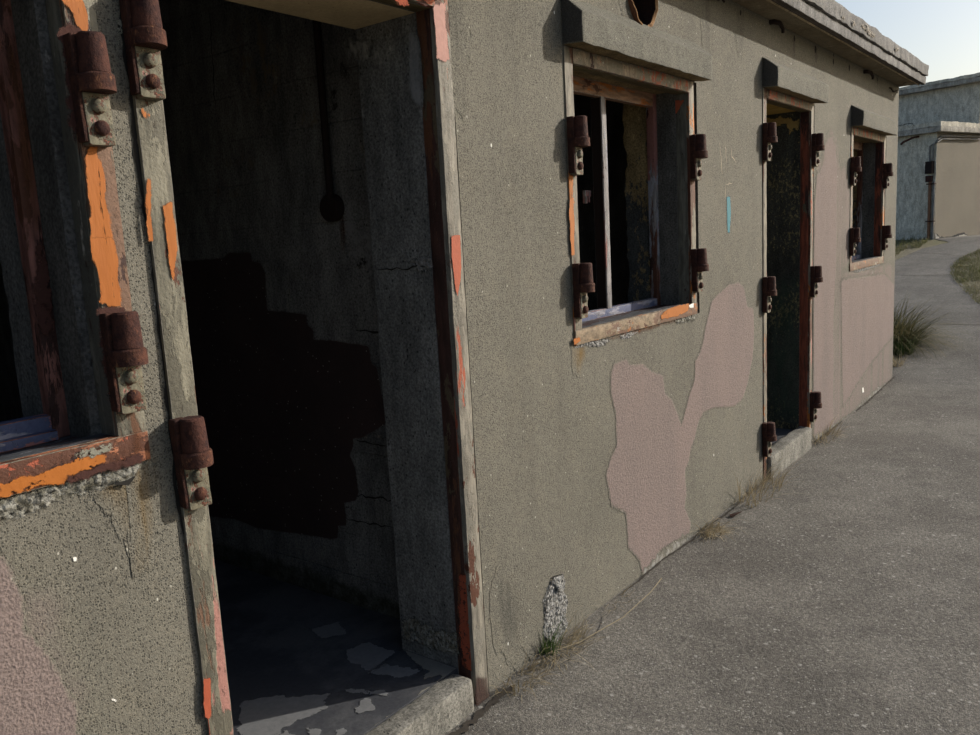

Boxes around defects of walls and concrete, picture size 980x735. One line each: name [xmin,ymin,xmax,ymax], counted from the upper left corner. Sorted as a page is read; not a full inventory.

peeling [62,0,88,31]
peeling [85,147,121,307]
peeling [163,202,178,280]
peeling [661,303,696,324]
spalling [0,443,155,520]
peeling [458,574,472,671]
spalling [543,574,568,644]
peeling [346,642,420,678]
peeling [236,693,331,735]
peeling [345,688,388,713]